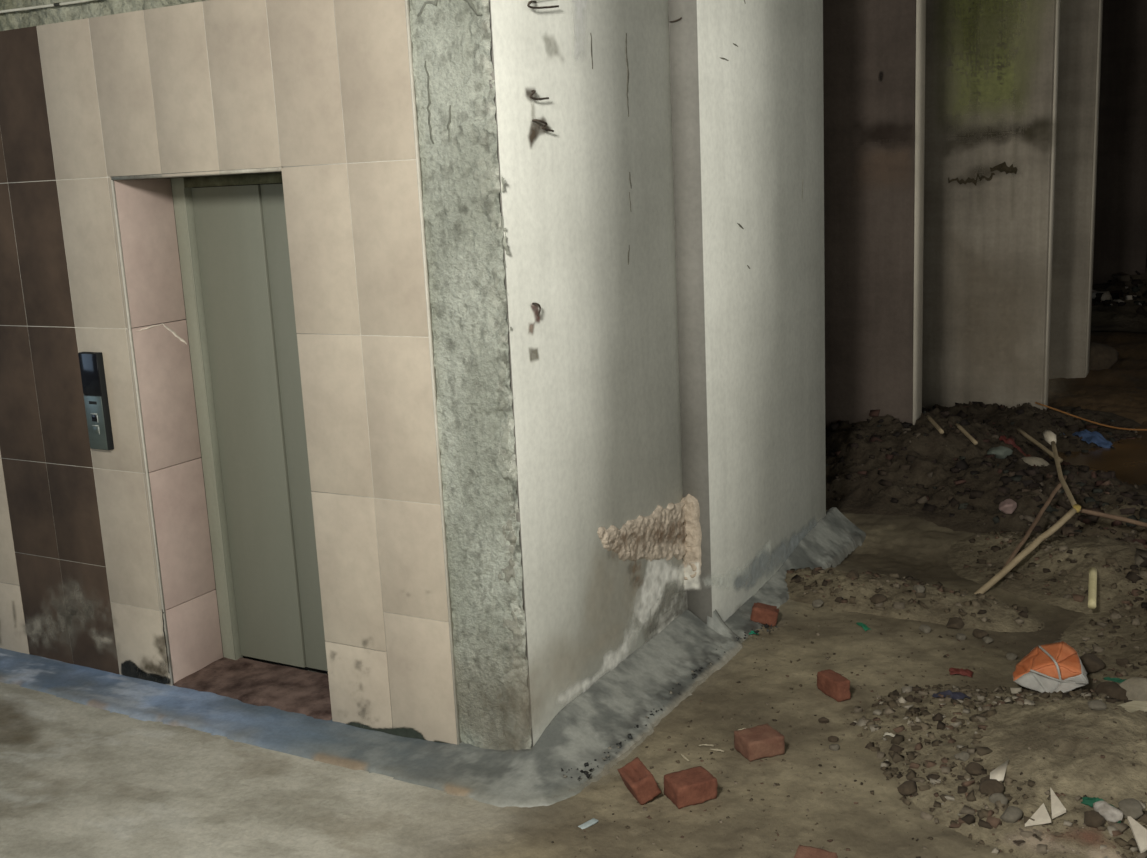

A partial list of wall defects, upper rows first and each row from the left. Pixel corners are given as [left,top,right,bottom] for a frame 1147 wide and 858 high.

rust [529,118,549,145]
crack [948,162,1017,185]
spalling [597,494,702,581]